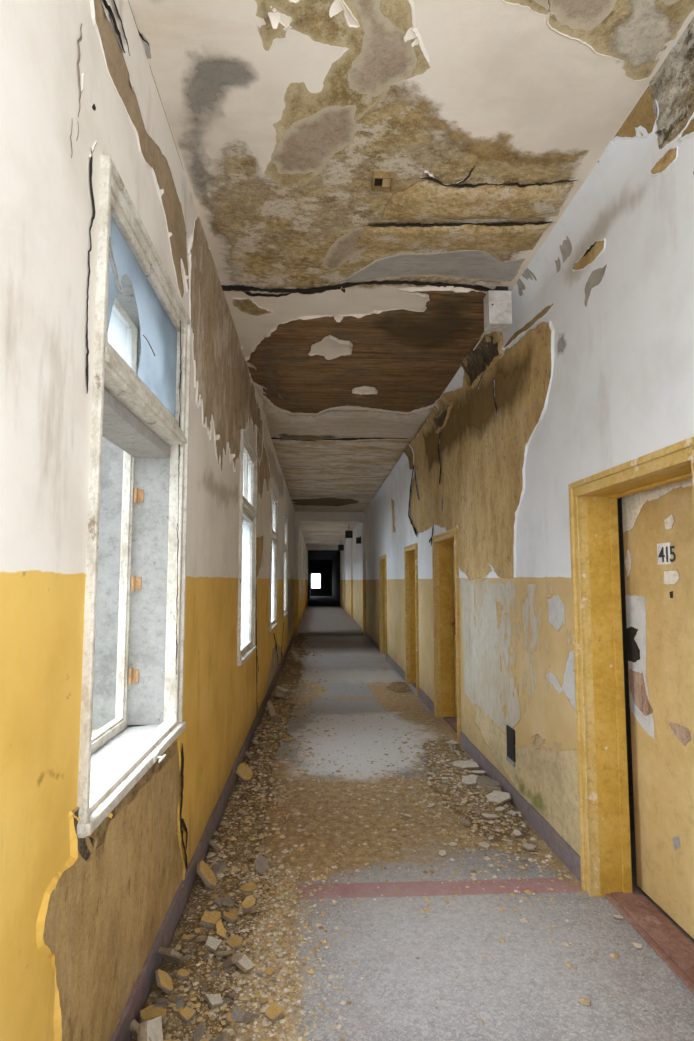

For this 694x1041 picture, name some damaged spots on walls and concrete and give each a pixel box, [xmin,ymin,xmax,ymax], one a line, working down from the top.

crack [103,0,184,170]
leakage [186,59,252,132]
flaking render [501,0,694,177]
leakage [613,0,678,67]
crack [70,23,97,394]
crack [221,280,495,297]
leakage [187,85,574,289]
crack [366,219,552,227]
peeling [555,236,607,307]
flaking render [90,0,580,855]
spalling [626,627,640,662]
flaking render [36,738,185,1041]